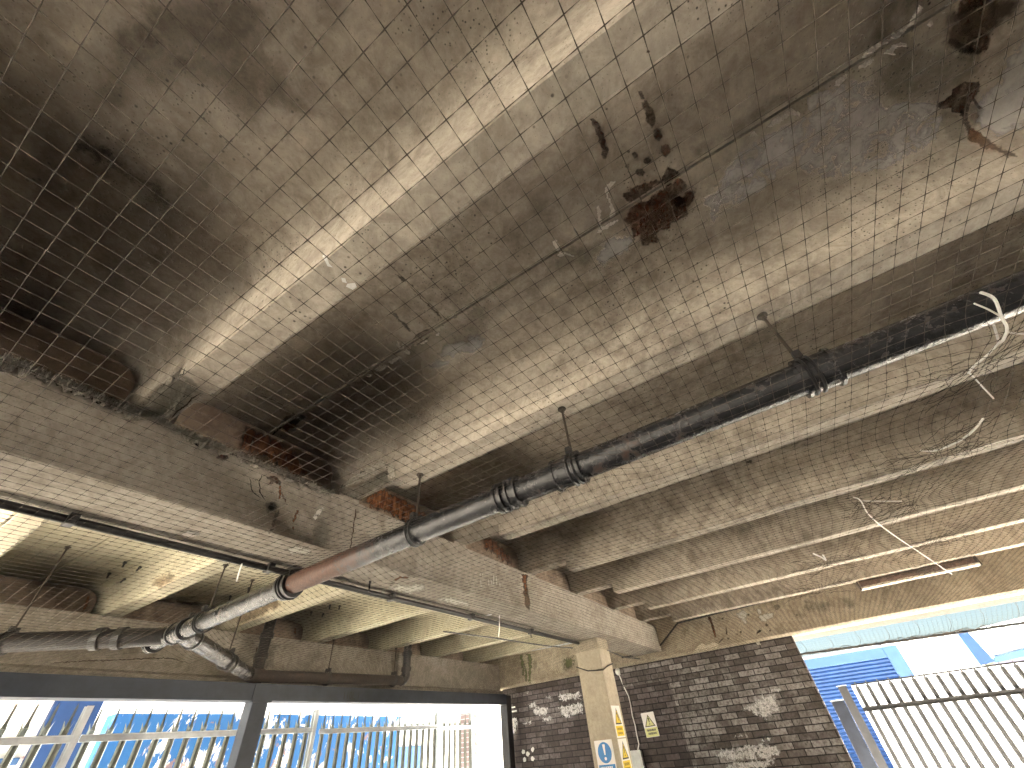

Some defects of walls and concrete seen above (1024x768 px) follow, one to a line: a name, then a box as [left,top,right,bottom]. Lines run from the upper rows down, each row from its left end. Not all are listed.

corrosion [943,0,1020,55]
water stain [706,5,1024,220]
corrosion [590,118,609,159]
corrosion [623,91,696,246]
water stain [596,181,631,262]
spalling [0,352,396,502]
spalling [534,515,565,528]
corrosion [522,574,530,610]
water stain [512,691,583,733]
water stain [744,689,780,720]
water stain [716,734,780,768]